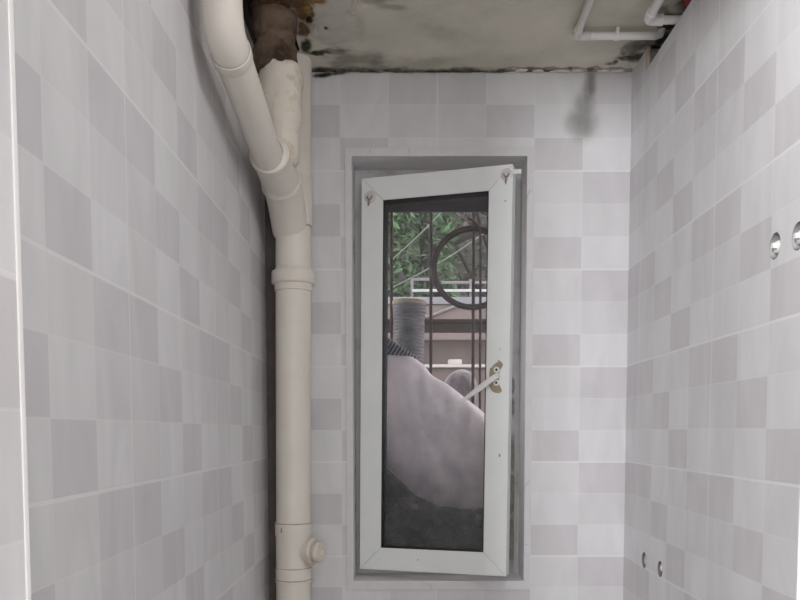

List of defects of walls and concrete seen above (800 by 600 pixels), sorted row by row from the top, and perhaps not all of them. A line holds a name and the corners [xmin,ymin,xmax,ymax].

water stain [301,39,344,56]
water stain [312,68,511,77]